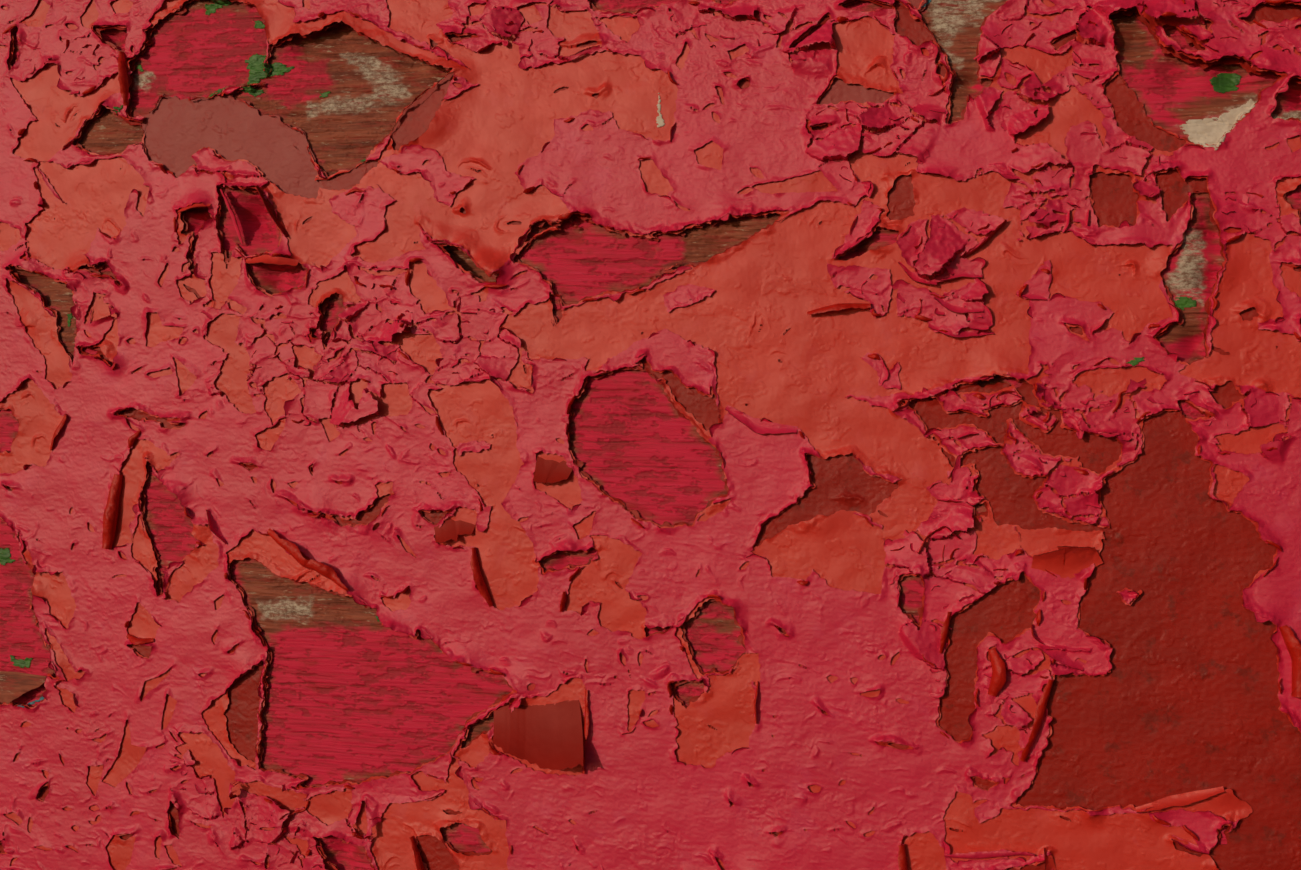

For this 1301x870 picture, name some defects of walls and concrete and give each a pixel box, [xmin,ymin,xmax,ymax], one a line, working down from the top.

peeling [0,0,160,481]
peeling [70,0,488,312]
peeling [0,407,597,870]
peeling [136,0,774,782]
peeling [499,0,1301,870]